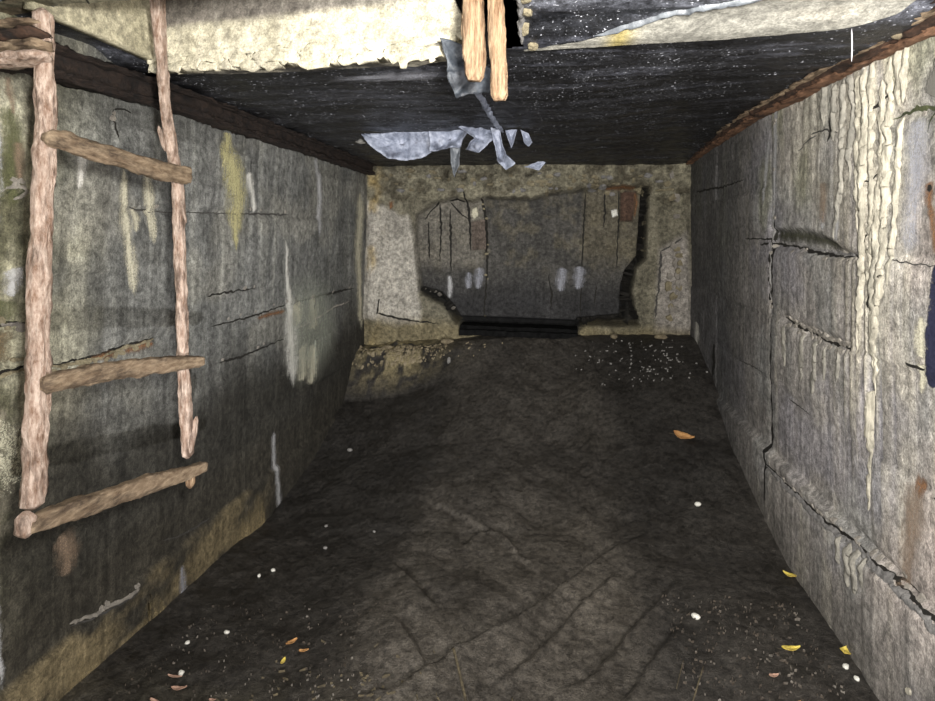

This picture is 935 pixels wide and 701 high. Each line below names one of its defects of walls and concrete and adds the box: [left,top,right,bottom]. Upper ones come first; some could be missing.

peeling [0,0,129,15]
peeling [516,0,916,51]
crack [873,91,935,132]
leakage [0,109,22,202]
rust [925,182,935,248]
leakage [5,268,22,296]
leakage [820,47,921,510]
crack [0,316,26,332]
crack [0,365,24,378]
crack [52,338,154,372]
crack [739,113,935,636]
rust [903,477,927,583]